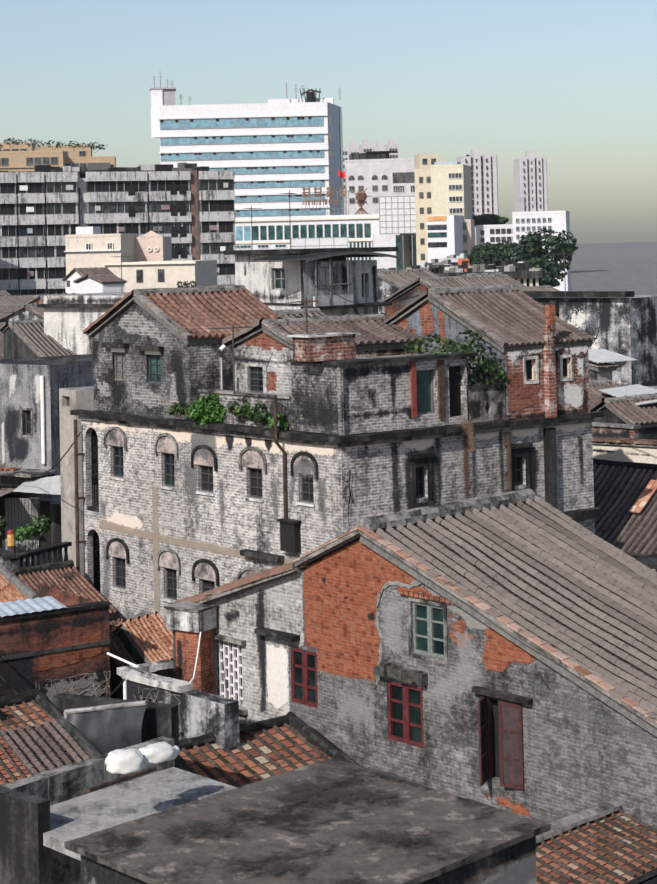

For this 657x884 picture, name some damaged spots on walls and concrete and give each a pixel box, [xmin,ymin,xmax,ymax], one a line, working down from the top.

water stain [33,374,41,432]
water stain [296,364,411,428]
flaking render [507,372,540,412]
peeling [556,336,600,412]
water stain [1,408,30,464]
flaking render [303,541,432,686]
flaking render [482,627,536,672]
water stain [80,855,147,884]
water stain [419,836,537,884]